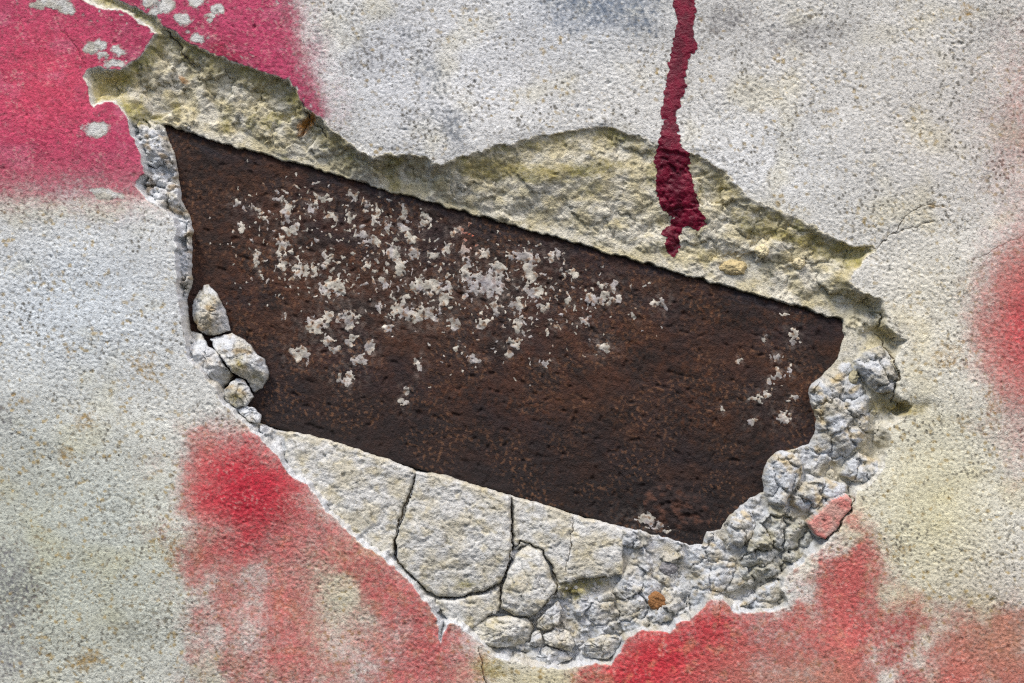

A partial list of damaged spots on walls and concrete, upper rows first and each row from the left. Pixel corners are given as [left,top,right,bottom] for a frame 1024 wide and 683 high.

spalling [80,0,911,669]
crack [393,470,574,608]
rust [642,485,711,531]